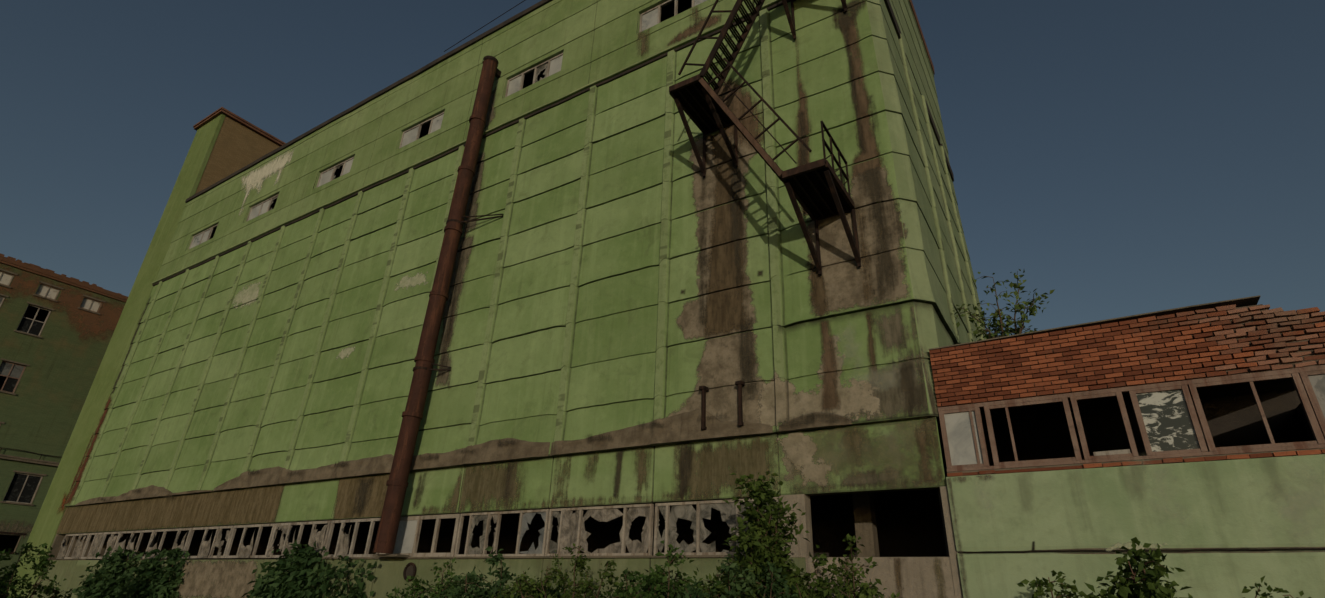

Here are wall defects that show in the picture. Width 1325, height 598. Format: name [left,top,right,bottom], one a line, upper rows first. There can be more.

flaking render [0,263,124,341]
damp [663,78,991,522]
damp [413,448,649,514]
peeling [776,432,902,487]